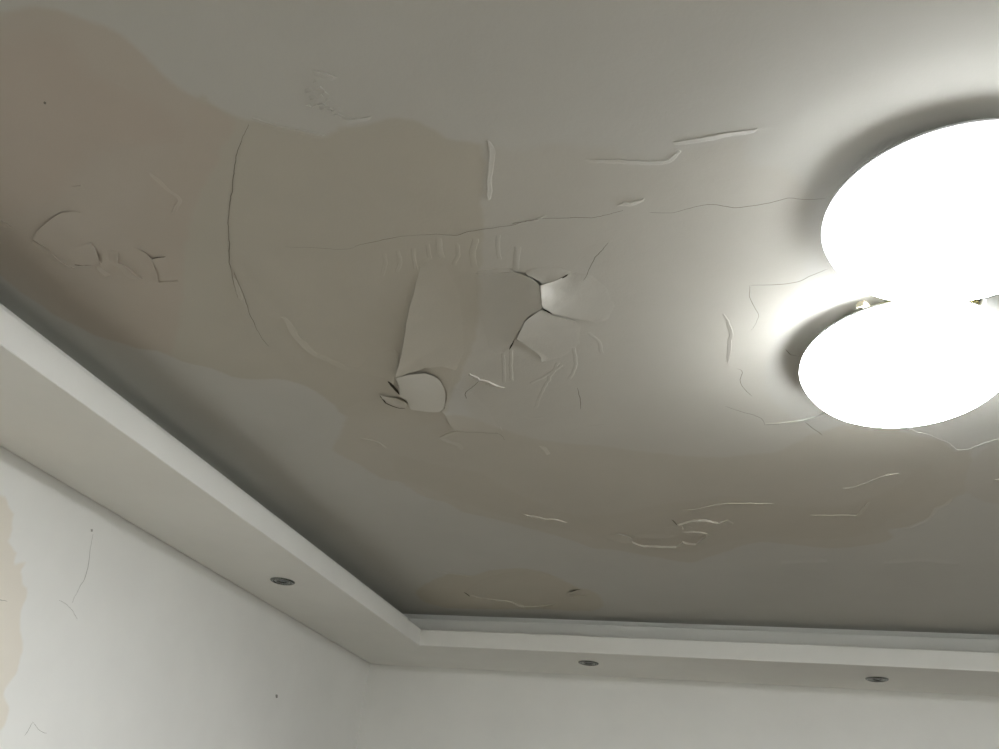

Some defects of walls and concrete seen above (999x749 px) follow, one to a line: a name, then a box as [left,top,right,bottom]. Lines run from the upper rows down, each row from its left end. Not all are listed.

crack [228,124,265,342]
peeling [282,262,506,450]
water stain [0,2,999,563]
crack [296,198,825,249]
peeling [584,128,758,165]
water stain [0,493,29,732]
water stain [414,567,606,611]